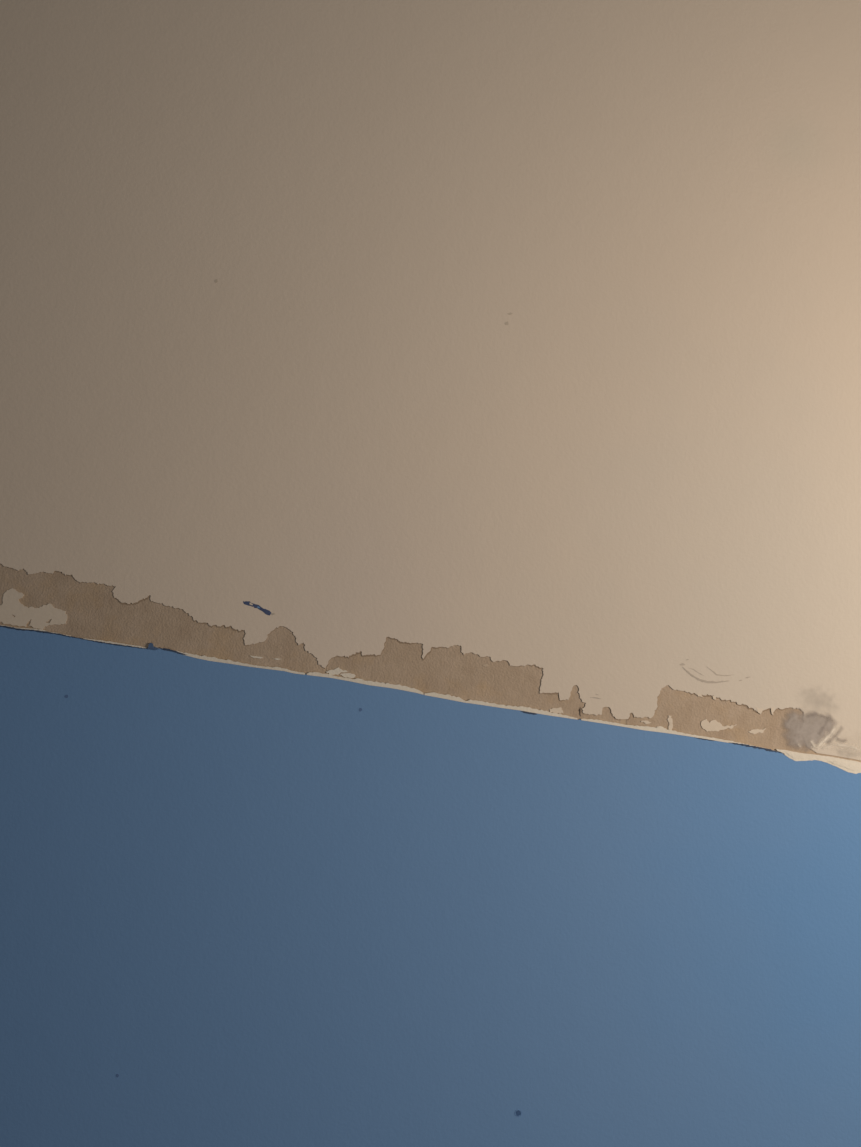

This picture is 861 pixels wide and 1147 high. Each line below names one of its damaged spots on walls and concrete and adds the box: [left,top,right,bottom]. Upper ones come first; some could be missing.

peeling [0,564,861,774]